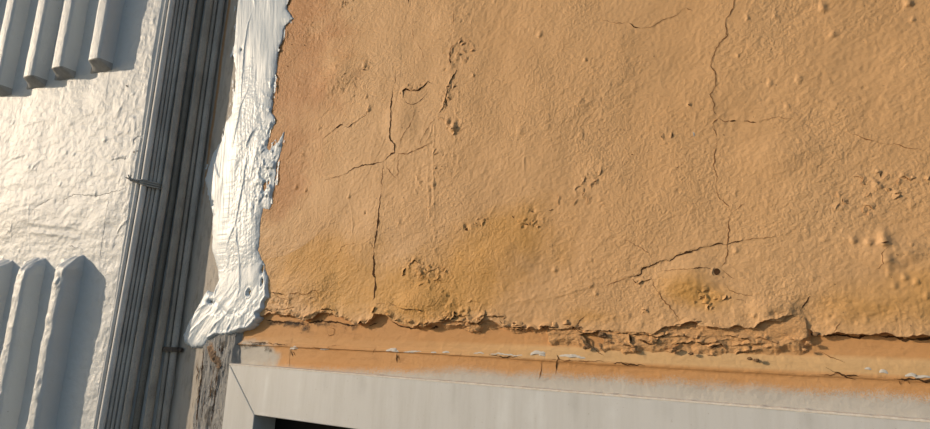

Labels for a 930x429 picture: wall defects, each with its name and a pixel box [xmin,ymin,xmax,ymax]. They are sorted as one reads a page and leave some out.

crack [251,45,454,356]
flaking render [264,287,820,362]
crack [608,0,796,318]